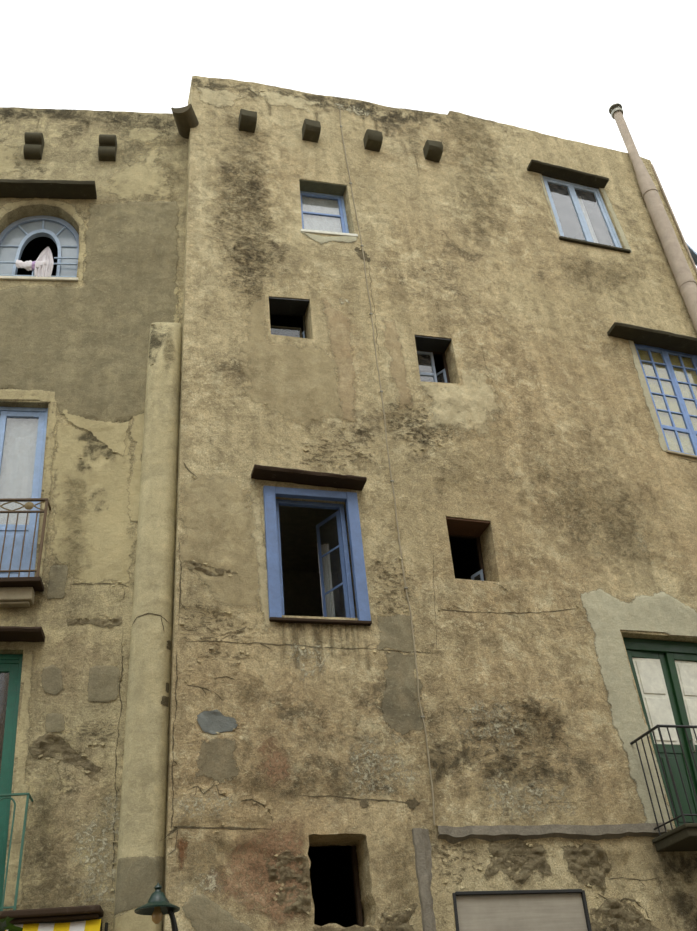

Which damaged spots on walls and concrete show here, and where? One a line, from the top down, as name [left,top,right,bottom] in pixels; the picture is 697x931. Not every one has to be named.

spalling [149,323,165,366]
flaking render [62,409,129,469]
crack [74,581,129,598]
spalling [30,722,115,778]
crack [111,543,581,902]
damp [431,742,466,780]
damp [465,701,561,751]
spalling [439,838,552,889]
spalling [562,843,659,931]